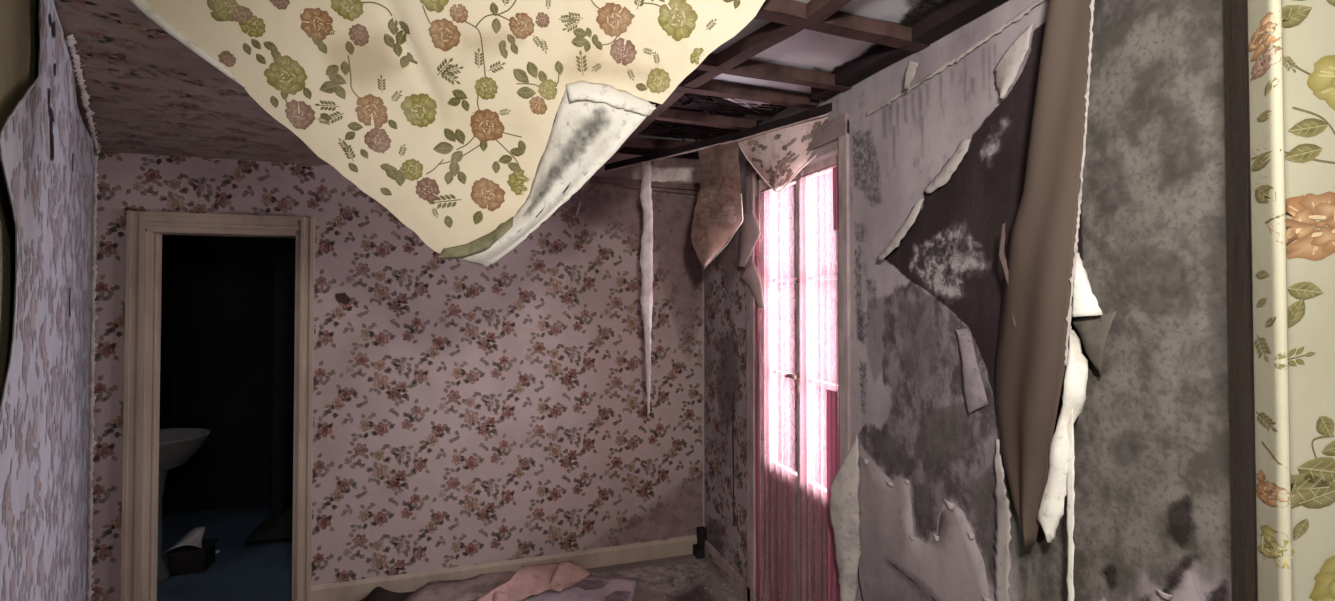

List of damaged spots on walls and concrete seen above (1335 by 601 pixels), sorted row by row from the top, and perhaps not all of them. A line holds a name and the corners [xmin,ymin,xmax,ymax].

peeling [65,34,101,601]
damp [528,112,746,331]
peeling [855,223,876,342]
damp [860,0,1255,601]